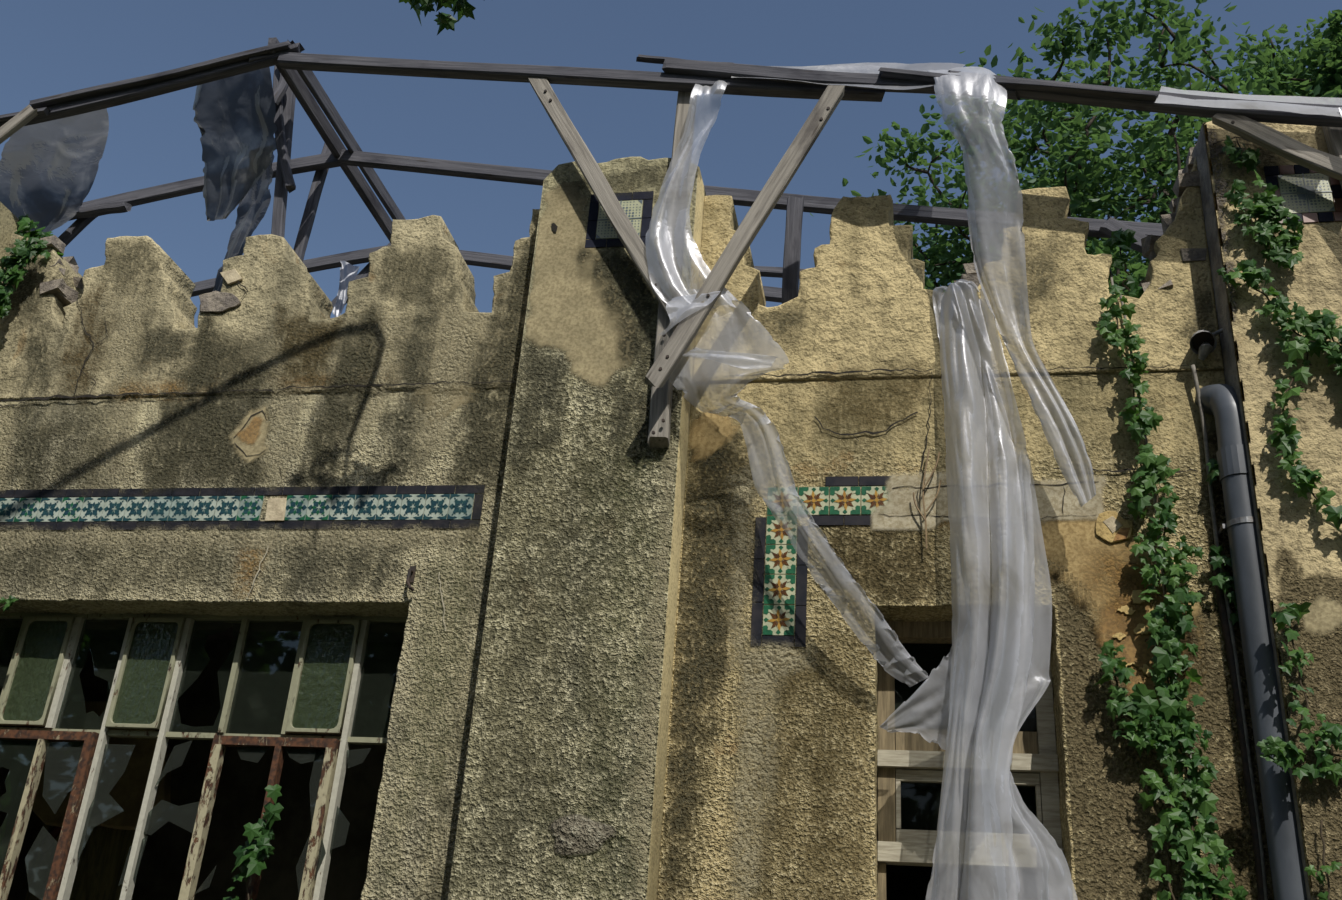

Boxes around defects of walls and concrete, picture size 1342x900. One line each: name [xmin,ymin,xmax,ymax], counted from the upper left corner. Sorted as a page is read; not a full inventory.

spalling [230,407,268,462]
crack [0,298,513,456]
water stain [0,244,565,488]
water stain [594,257,655,460]
crack [763,368,948,517]
peeling [872,472,949,529]
crack [1034,468,1138,519]
crack [1048,363,1188,371]
water stain [629,433,806,900]
flaking render [1034,477,1207,717]